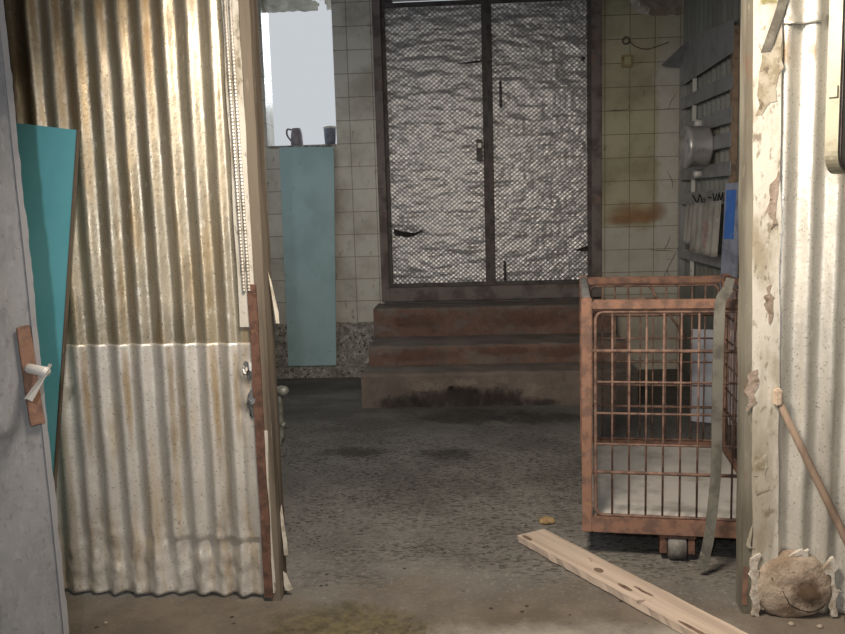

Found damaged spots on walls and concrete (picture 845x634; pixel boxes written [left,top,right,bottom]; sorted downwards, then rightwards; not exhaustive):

peeling [756,42,784,115]
peeling [766,170,780,229]
peeling [763,285,775,325]
leakage [384,388,570,422]
peeling [744,369,759,411]